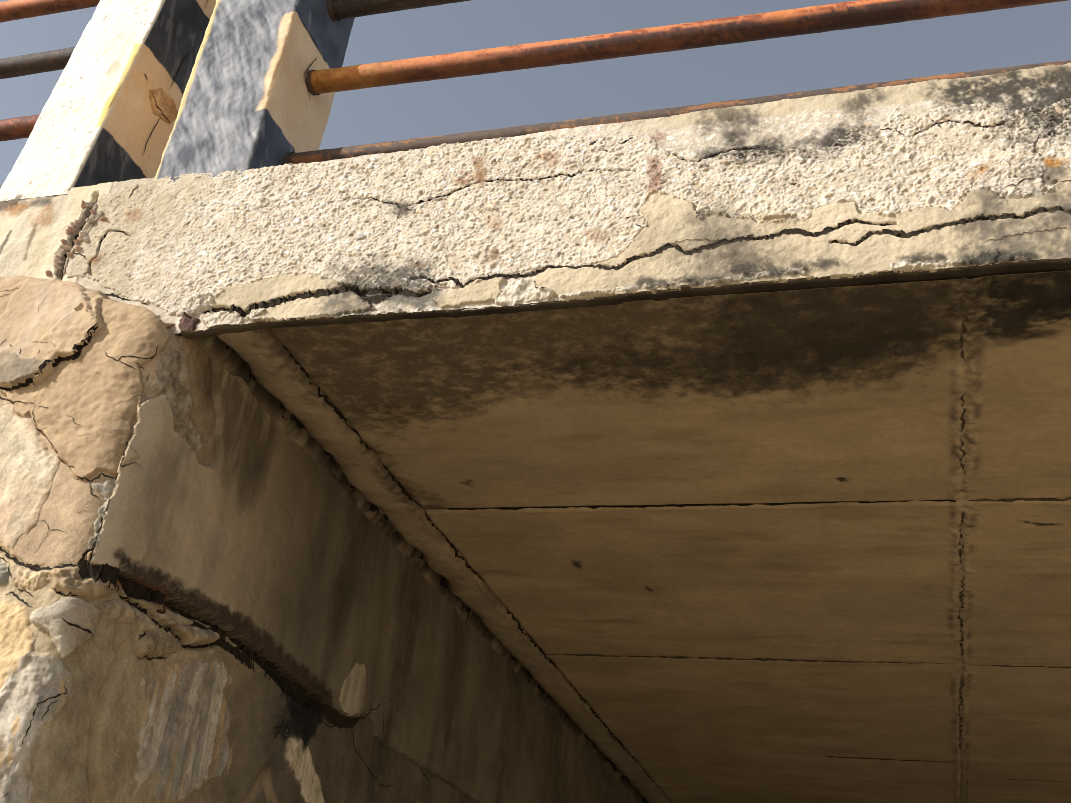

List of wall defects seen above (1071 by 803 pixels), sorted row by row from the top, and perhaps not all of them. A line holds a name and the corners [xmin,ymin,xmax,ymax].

peeling [149,88,178,124]
crack [881,118,1004,136]
crack [204,134,1071,317]
spalling [0,98,1071,549]
flaking render [87,479,118,565]
crack [0,200,394,787]
spalling [0,597,101,803]
spalling [133,657,234,803]
spalling [283,735,325,803]
peeling [339,663,367,716]